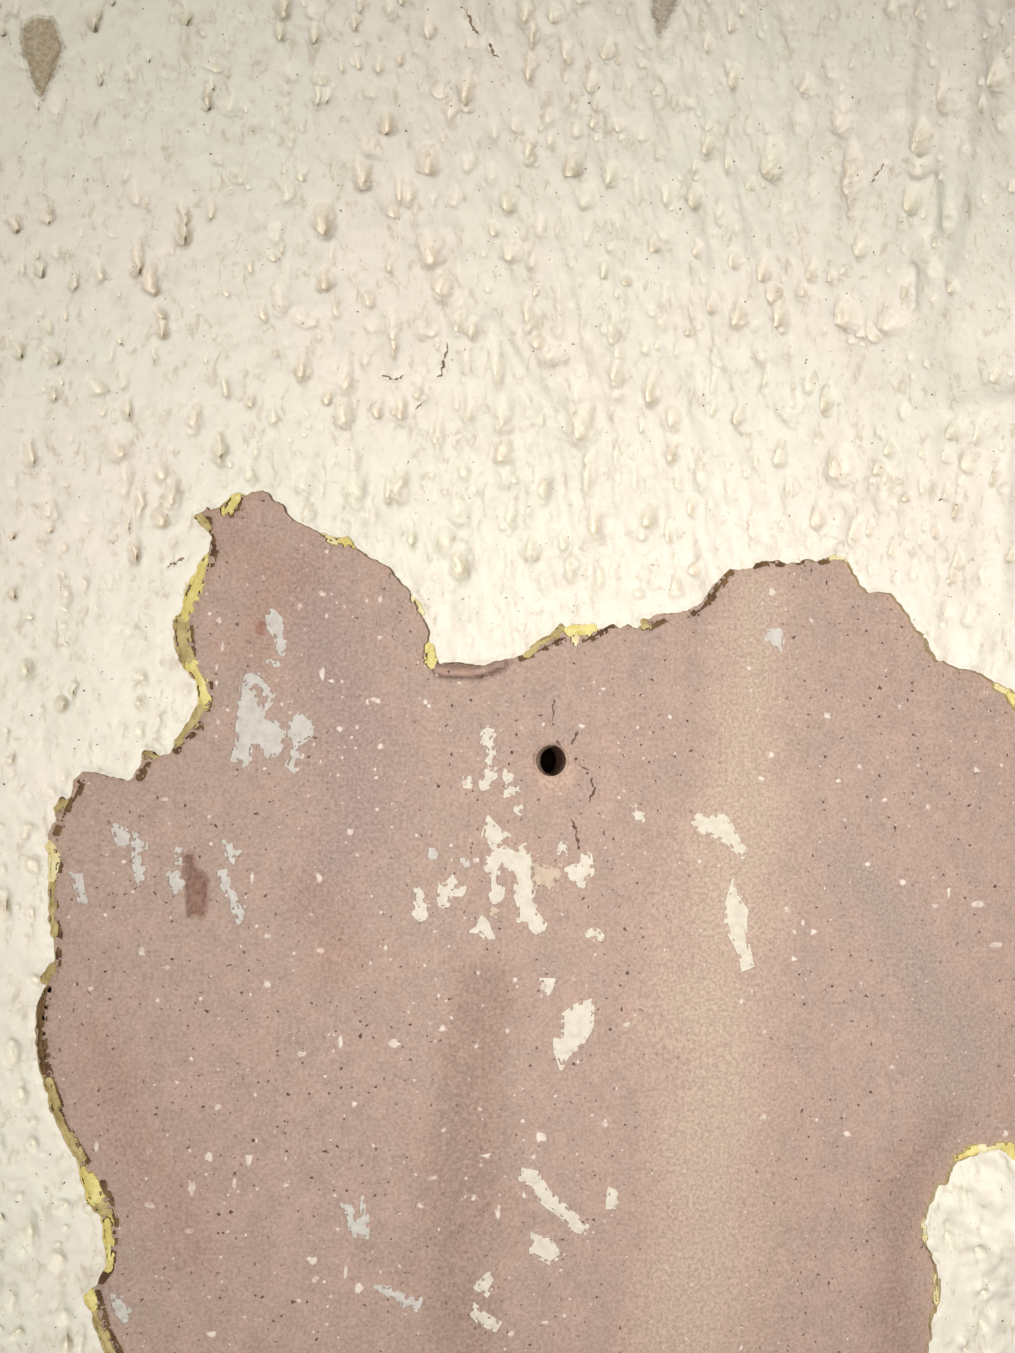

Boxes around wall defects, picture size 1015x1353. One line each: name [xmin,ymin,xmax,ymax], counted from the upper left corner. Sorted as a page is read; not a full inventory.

peeling [36,492,1015,1353]